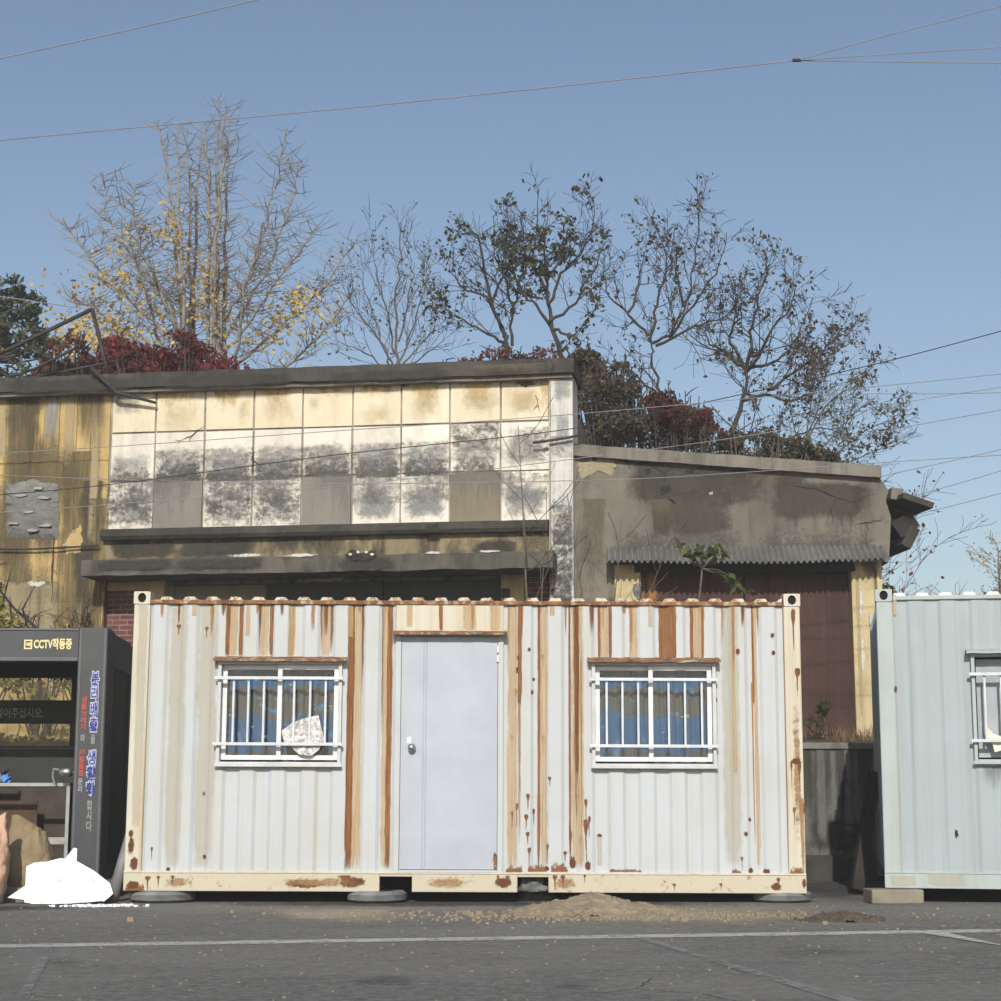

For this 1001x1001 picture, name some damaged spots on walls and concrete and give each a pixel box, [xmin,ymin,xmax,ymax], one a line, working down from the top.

leakage [0,374,572,628]
leakage [584,499,604,562]
leakage [623,462,761,549]
leakage [762,476,872,548]
leakage [864,562,877,589]
corrosion [205,604,295,655]
corrosion [464,605,476,630]
corrosion [689,606,704,658]
corrosion [288,604,365,889]
corrosion [491,572,676,889]
corrosion [431,879,462,888]